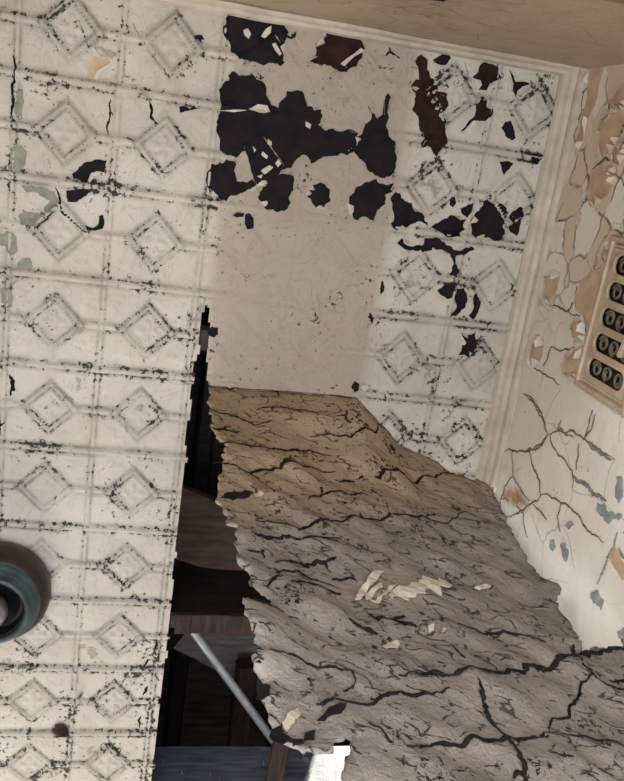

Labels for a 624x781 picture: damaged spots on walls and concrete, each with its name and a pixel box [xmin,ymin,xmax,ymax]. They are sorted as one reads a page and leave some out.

peeling [223,14,297,66]
peeling [309,33,365,72]
crack [9,56,17,122]
peeling [411,54,451,157]
peeling [461,62,530,134]
peeling [18,159,107,226]
peeling [85,215,105,231]
peeling [206,71,524,319]
crack [534,286,586,385]
crack [207,386,475,612]
crack [500,393,624,584]
crack [349,613,417,635]